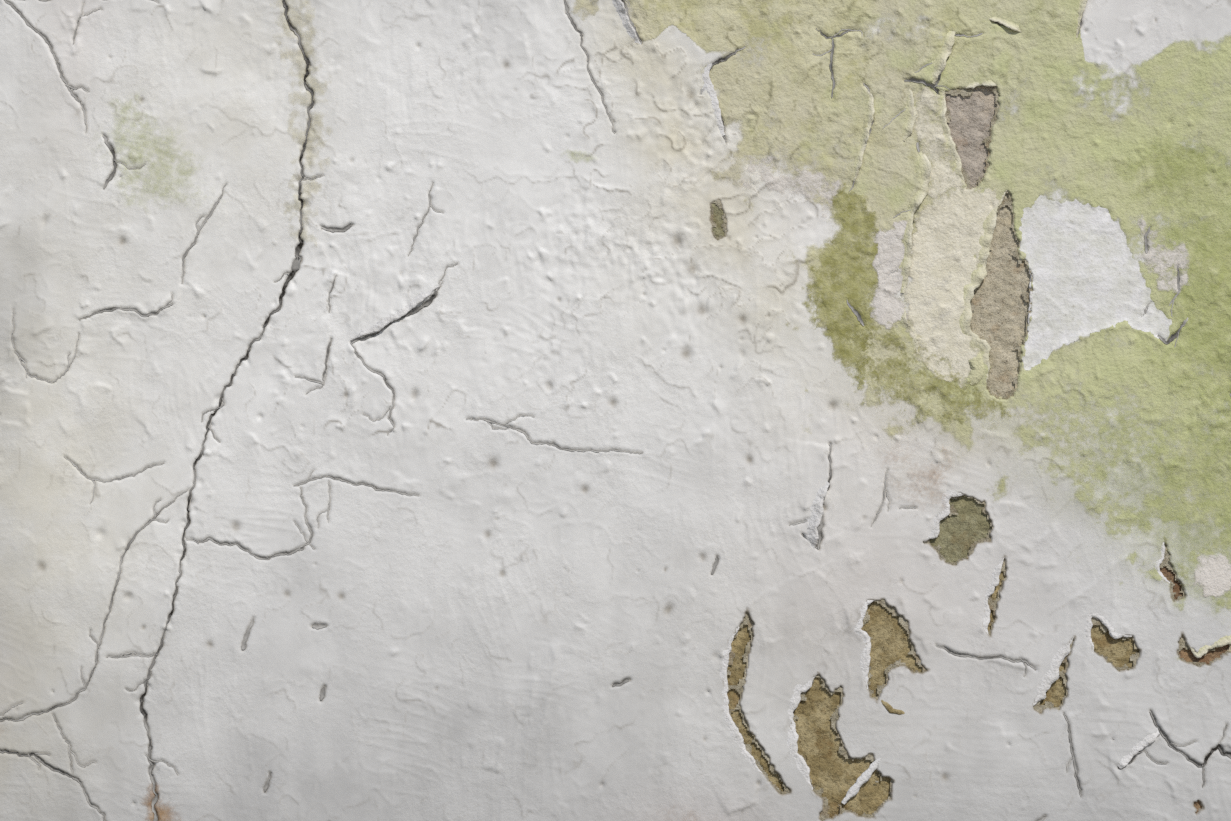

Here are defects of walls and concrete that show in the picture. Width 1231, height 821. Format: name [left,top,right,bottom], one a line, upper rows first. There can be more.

crack [408,183,444,256]
crack [295,263,458,435]
peeling [627,0,1231,610]
crack [0,0,419,821]
crack [467,414,643,453]
peeling [719,612,790,794]
peeling [787,673,893,821]
peeling [853,599,927,715]
crack [1064,713,1082,797]
peeling [1033,613,1140,713]
crack [1117,711,1231,787]
peeling [1177,635,1231,667]